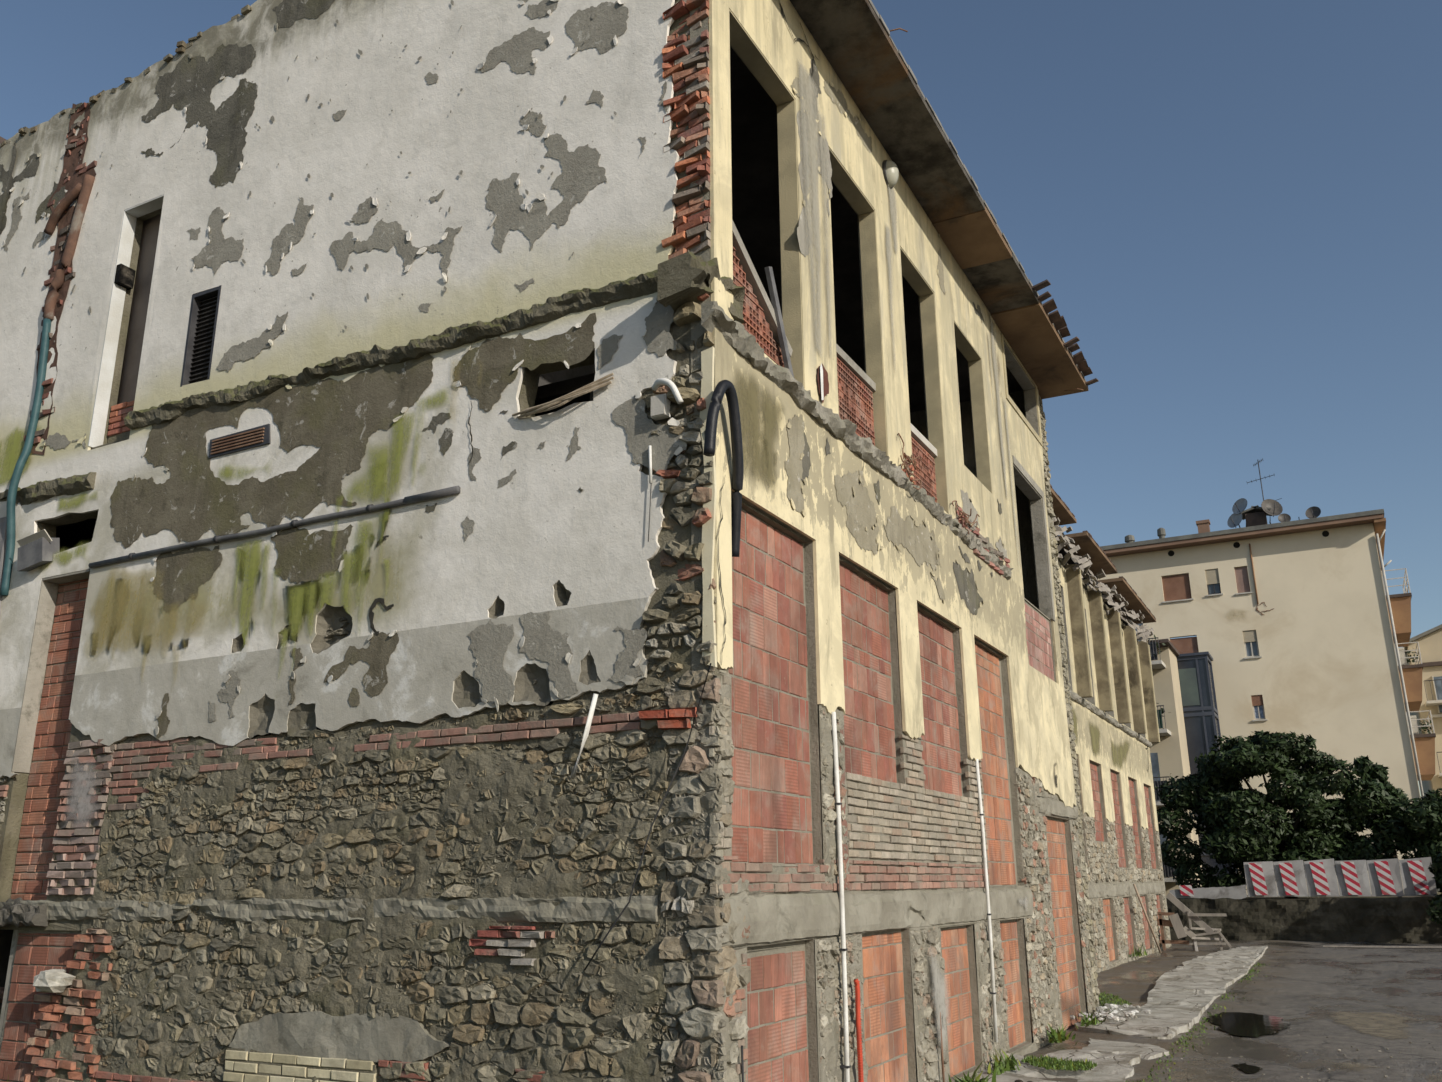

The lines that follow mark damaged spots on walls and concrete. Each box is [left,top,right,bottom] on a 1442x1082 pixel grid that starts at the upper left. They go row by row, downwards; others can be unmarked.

crack [0,142,17,230]
flaking render [141,43,274,188]
flaking render [330,188,462,292]
flaking render [486,106,607,252]
flaking render [452,313,623,414]
water stain [0,429,37,484]
flaking render [110,354,434,613]
water stain [100,541,268,646]
flaking render [208,604,399,739]
water stain [282,522,399,647]
flaking render [453,580,647,712]
crack [718,478,726,665]